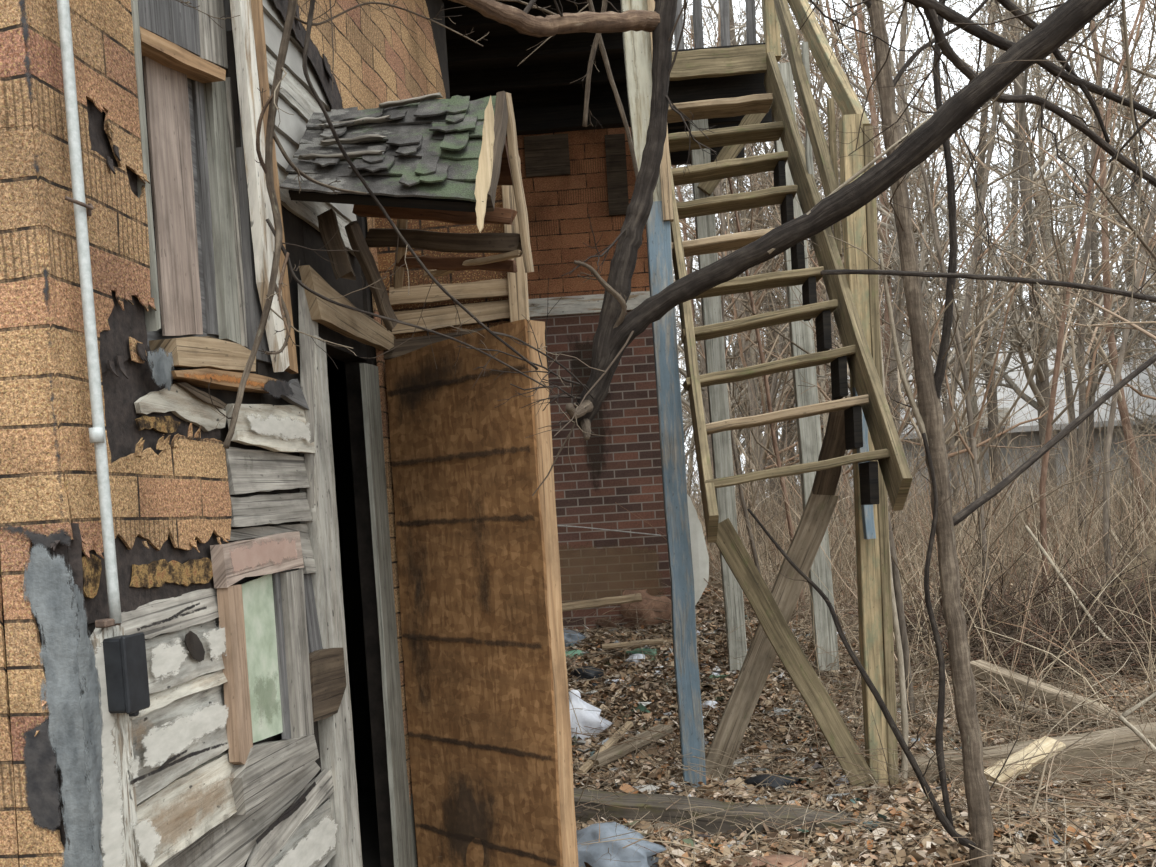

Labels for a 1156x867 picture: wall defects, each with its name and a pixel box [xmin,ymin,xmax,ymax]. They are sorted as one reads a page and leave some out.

peeling [93,97,121,174]
peeling [134,169,151,184]
peeling [107,337,147,379]
peeling [135,423,200,457]